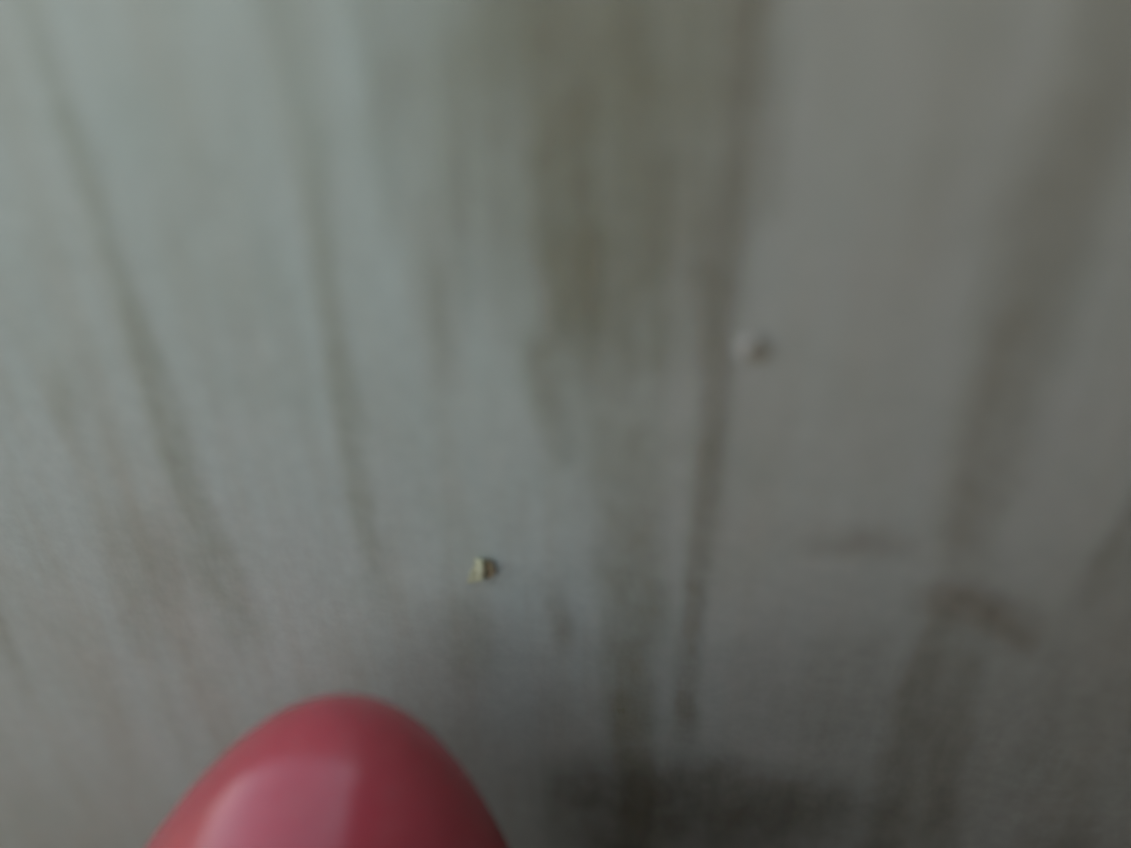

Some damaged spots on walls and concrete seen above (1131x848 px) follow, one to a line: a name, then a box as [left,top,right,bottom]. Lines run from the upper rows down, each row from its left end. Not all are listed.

peeling [467,557,495,583]